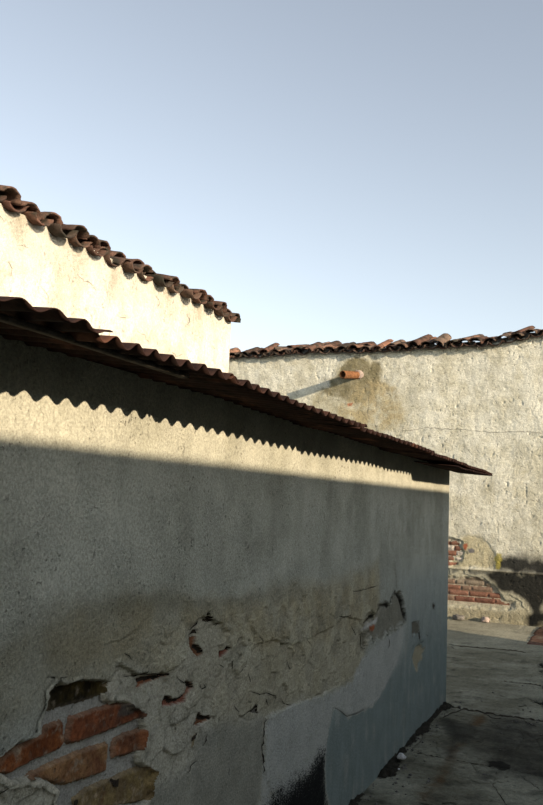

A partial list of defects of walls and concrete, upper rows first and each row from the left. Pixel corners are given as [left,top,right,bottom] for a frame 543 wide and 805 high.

damp [308,354,411,434]
spalling [448,533,516,609]
spalling [135,673,170,688]
spalling [189,630,203,657]
peeling [242,589,422,780]
spalling [0,672,159,805]
crack [443,705,543,749]